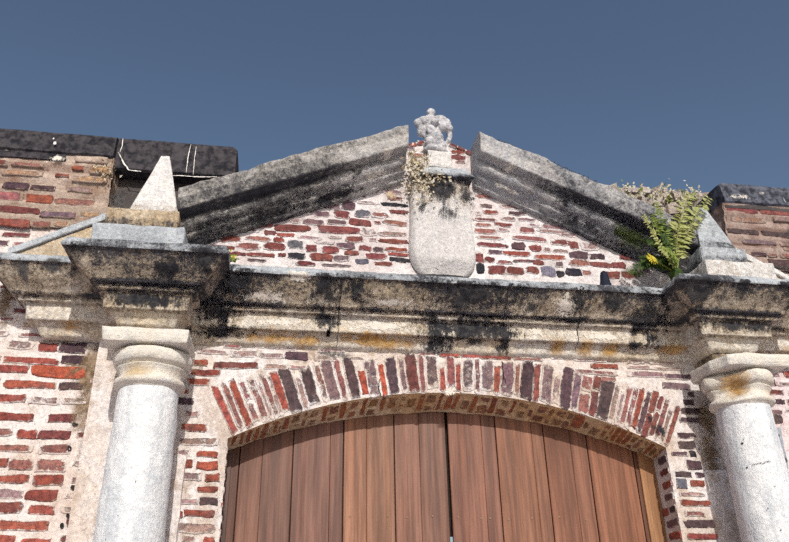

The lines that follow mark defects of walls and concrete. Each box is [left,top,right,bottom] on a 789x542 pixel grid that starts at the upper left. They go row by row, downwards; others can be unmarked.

water stain [193,166,375,237]
water stain [552,189,614,237]
water stain [14,258,29,282]
water stain [42,258,62,273]
water stain [67,240,92,260]
water stain [104,247,545,356]
water stain [555,286,671,350]
water stain [683,276,772,334]
water stain [767,281,789,311]